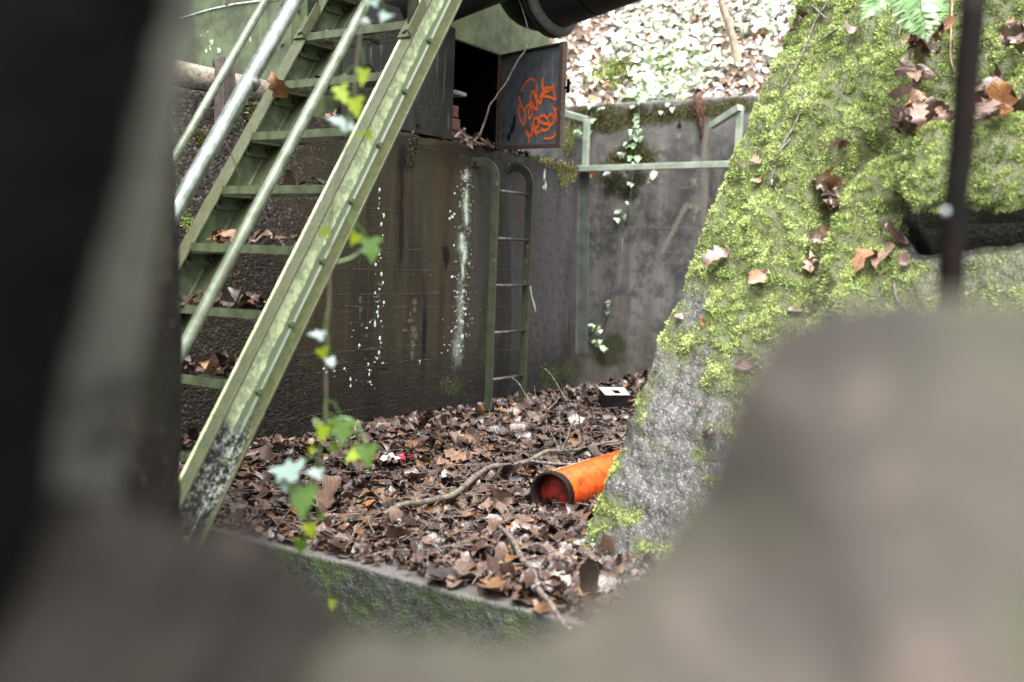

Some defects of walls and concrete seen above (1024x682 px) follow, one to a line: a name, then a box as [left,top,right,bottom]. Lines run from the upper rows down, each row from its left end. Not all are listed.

efflorescence [353,253,385,389]
damp [439,168,488,368]